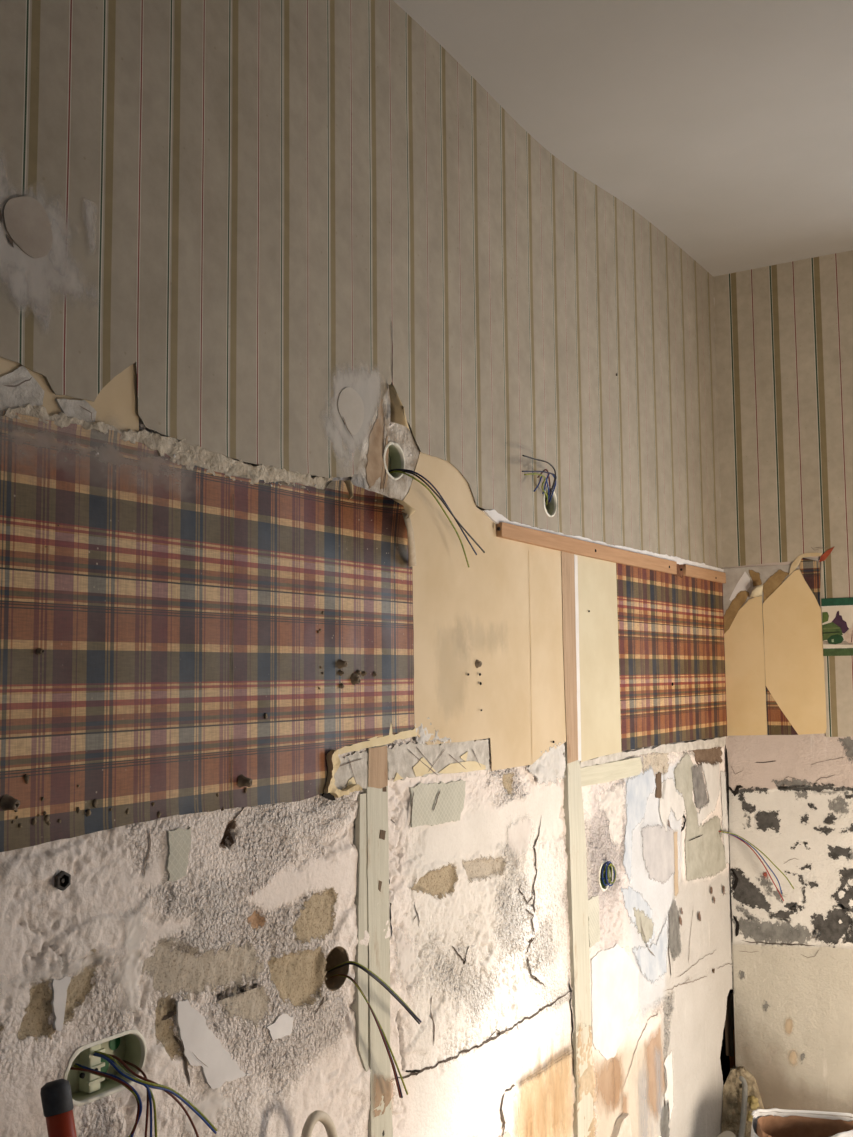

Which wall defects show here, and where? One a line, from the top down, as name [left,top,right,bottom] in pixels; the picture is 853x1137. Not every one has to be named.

flaking render [0,366,96,422]
flaking render [220,816,237,848]
flaking render [411,856,506,899]
peeling [621,753,669,946]
peeling [691,747,723,826]
peeling [730,778,853,948]
flaking render [17,949,102,1040]
flaking render [143,888,338,1089]
crack [389,815,574,1080]
peeling [590,943,639,1060]
peeling [669,900,681,961]
peeling [661,1103,670,1137]